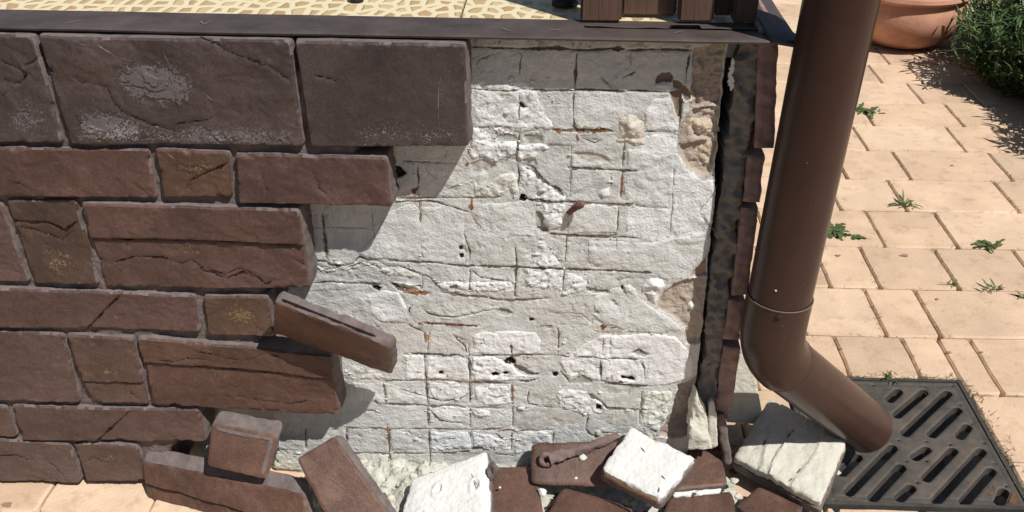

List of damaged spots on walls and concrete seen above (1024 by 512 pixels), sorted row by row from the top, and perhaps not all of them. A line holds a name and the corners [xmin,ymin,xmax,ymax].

leakage [71,60,295,147]
crack [87,297,118,329]
crack [100,46,692,487]
peeling [317,44,735,439]
peeling [346,317,552,462]